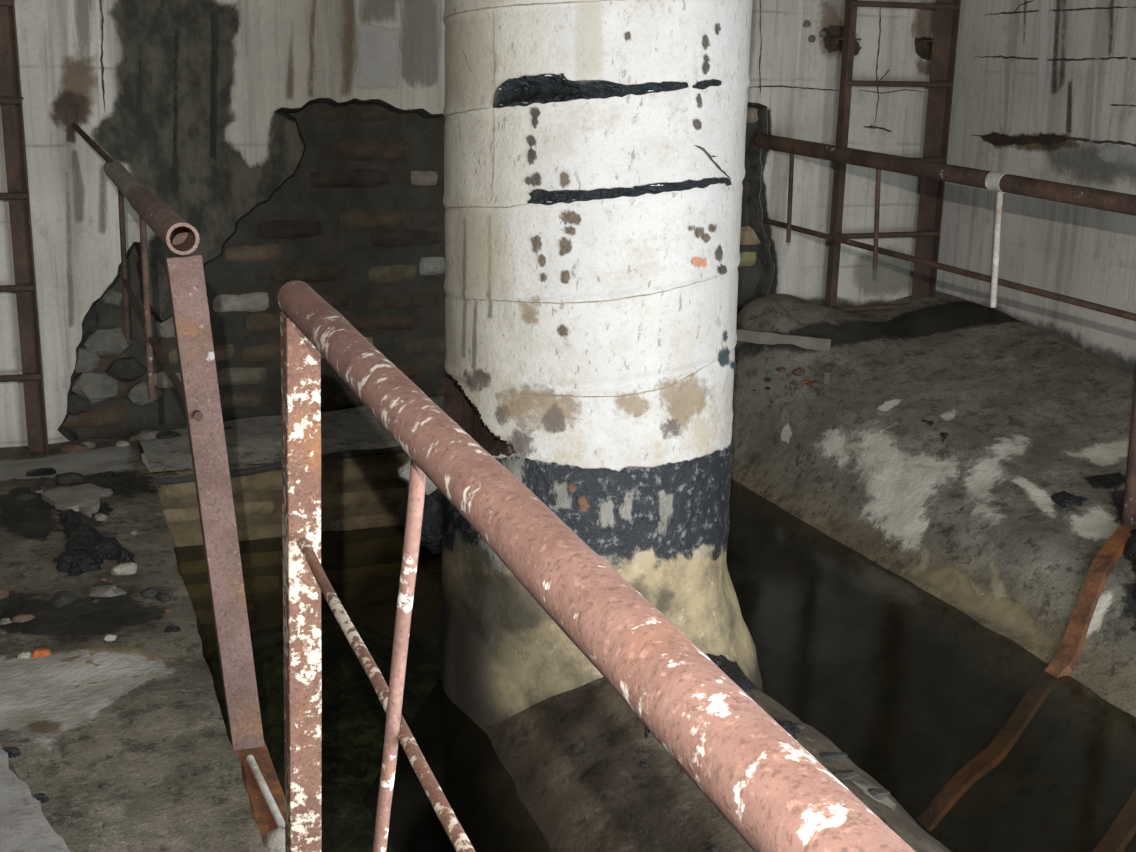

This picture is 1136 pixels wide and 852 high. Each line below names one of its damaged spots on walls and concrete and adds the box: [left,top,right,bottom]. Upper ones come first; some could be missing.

rust [52,60,96,142]
water stain [77,0,304,321]
spalling [203,98,516,457]
crack [463,11,732,205]
spalling [688,102,774,315]
water stain [1035,0,1072,133]
water stain [1048,0,1136,183]
spalling [0,242,203,547]
spalling [229,463,283,541]
spalling [321,452,408,531]
water stain [597,490,639,527]
water stain [658,490,673,533]